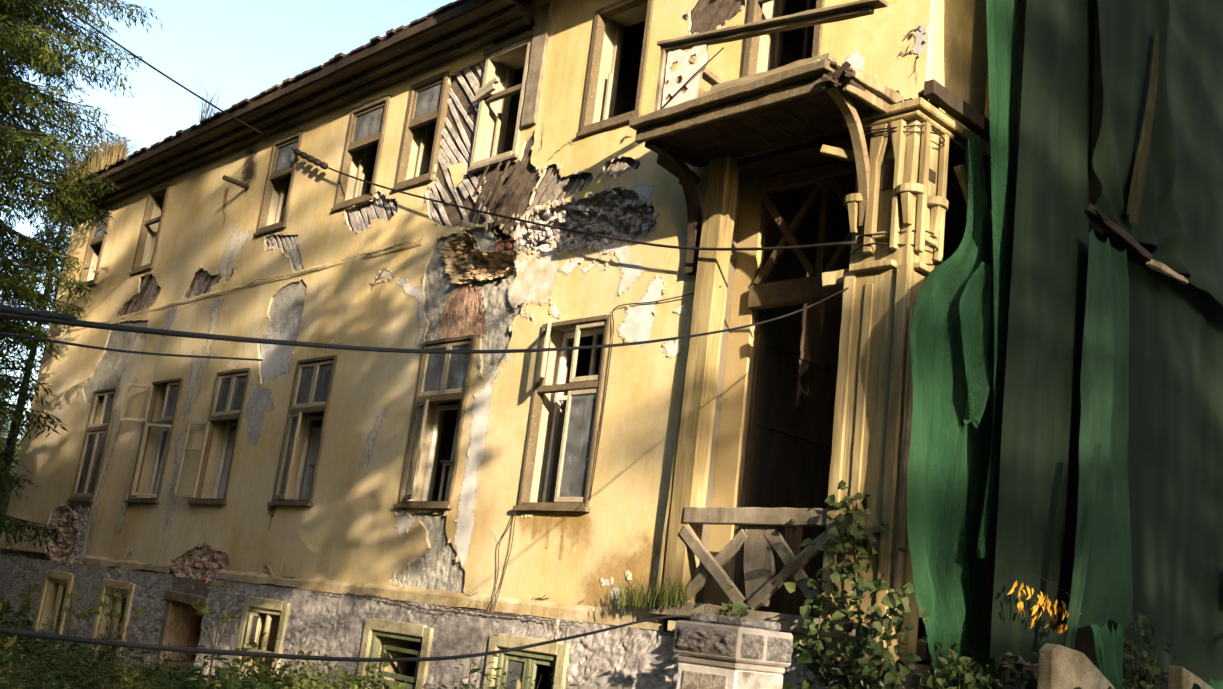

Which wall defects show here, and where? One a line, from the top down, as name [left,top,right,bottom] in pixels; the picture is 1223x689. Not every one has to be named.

flaking render [83,265,238,407]
flaking render [242,232,307,447]
flaking render [391,154,683,593]
spalling [170,542,230,590]